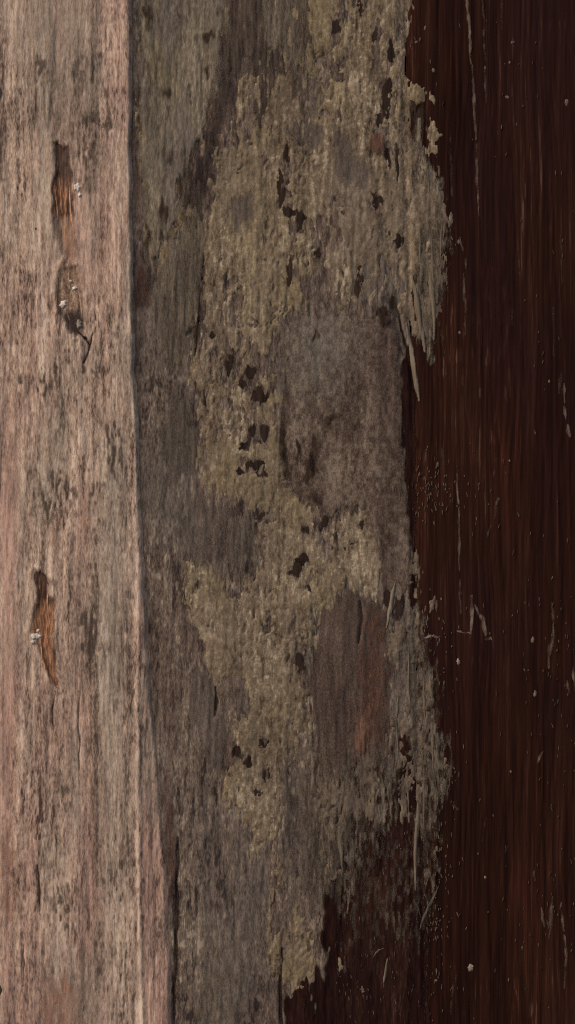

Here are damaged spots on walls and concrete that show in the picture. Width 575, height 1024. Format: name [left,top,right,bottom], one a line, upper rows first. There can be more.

spalling [371,26,395,62]
peeling [234,71,265,128]
peeling [356,77,443,156]
spalling [277,143,306,231]
spalling [372,193,383,211]
spalling [384,147,399,182]
crack [77,330,93,363]
spalling [224,354,269,406]
peeling [236,252,438,786]
spalling [232,739,270,798]
peeling [394,765,427,823]